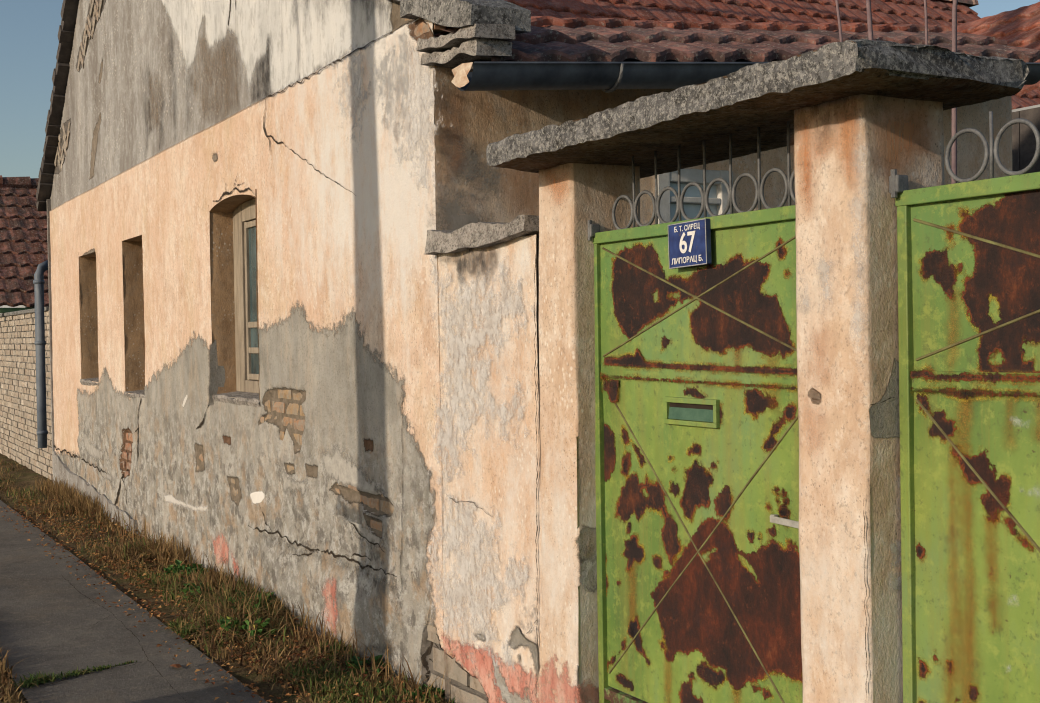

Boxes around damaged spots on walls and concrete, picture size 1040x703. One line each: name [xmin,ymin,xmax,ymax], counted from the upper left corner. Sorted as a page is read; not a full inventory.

flaking render [54,118,71,174]
flaking render [76,0,106,72]
leakage [253,45,271,98]
peeling [161,0,500,192]
crack [263,19,413,196]
flaking render [440,193,478,231]
flaking render [56,259,539,703]
crack [248,387,403,604]
rust [600,237,798,452]
rust [604,424,803,703]
flaking render [869,358,900,438]
rust [910,190,1040,552]